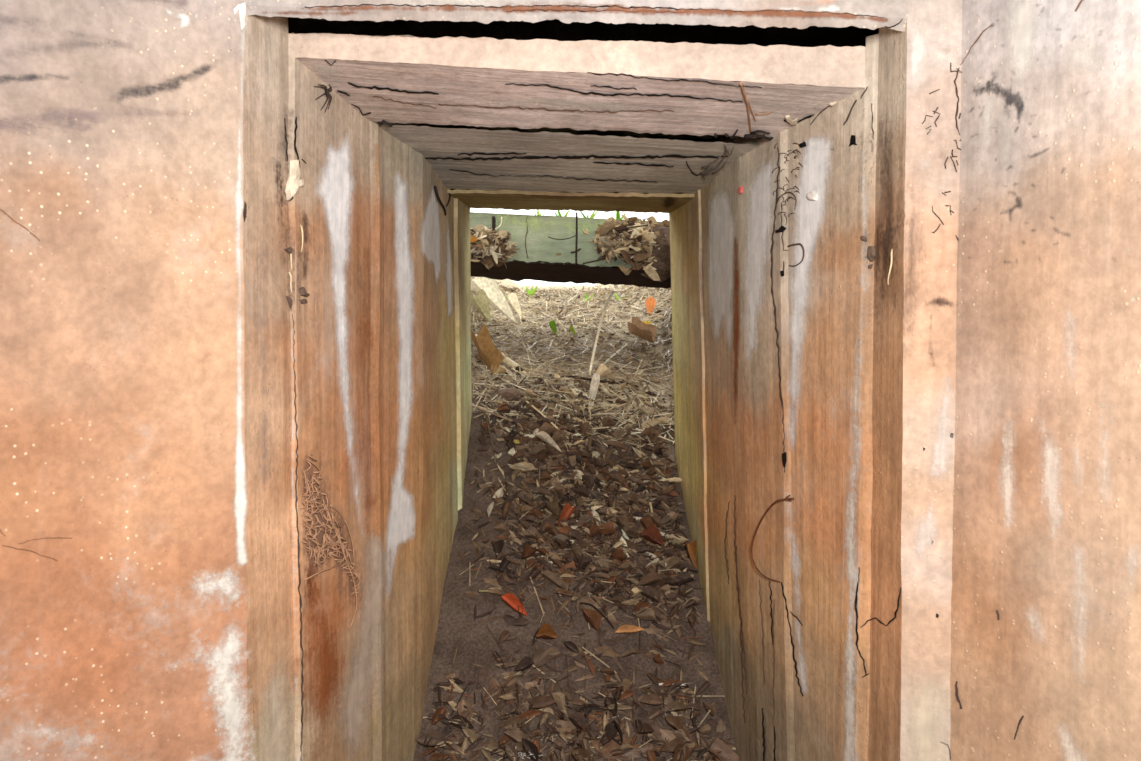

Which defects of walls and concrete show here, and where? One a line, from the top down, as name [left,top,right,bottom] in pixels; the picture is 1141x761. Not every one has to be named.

crack [325,60,762,116]
crack [425,152,728,183]
crack [513,218,612,268]
water stain [319,142,353,450]
water stain [341,175,452,748]
water stain [195,571,241,603]
water stain [196,630,248,761]
water stain [263,674,292,761]